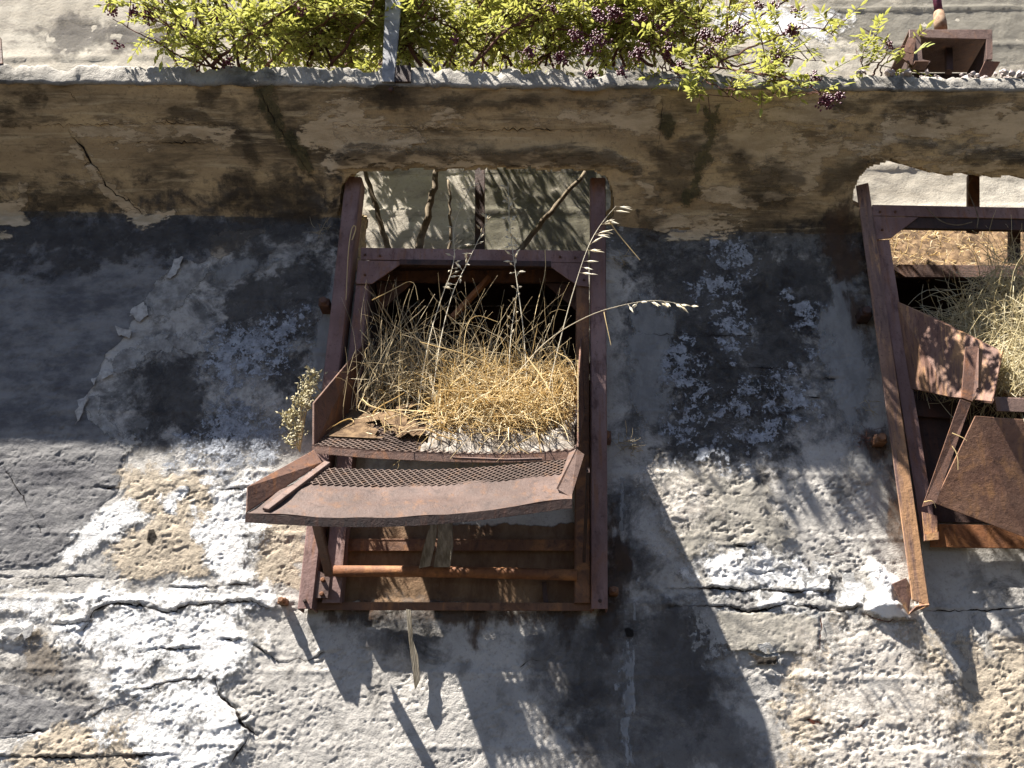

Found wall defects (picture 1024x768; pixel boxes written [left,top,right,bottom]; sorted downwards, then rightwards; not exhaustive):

crack [50,90,223,214]
leakage [658,113,676,140]
peeling [0,118,266,580]
leakage [619,216,886,551]
crack [2,575,264,630]
spalling [254,524,306,590]
crack [668,545,1020,650]
crack [139,646,193,654]
crack [2,729,164,759]
crack [93,678,261,767]